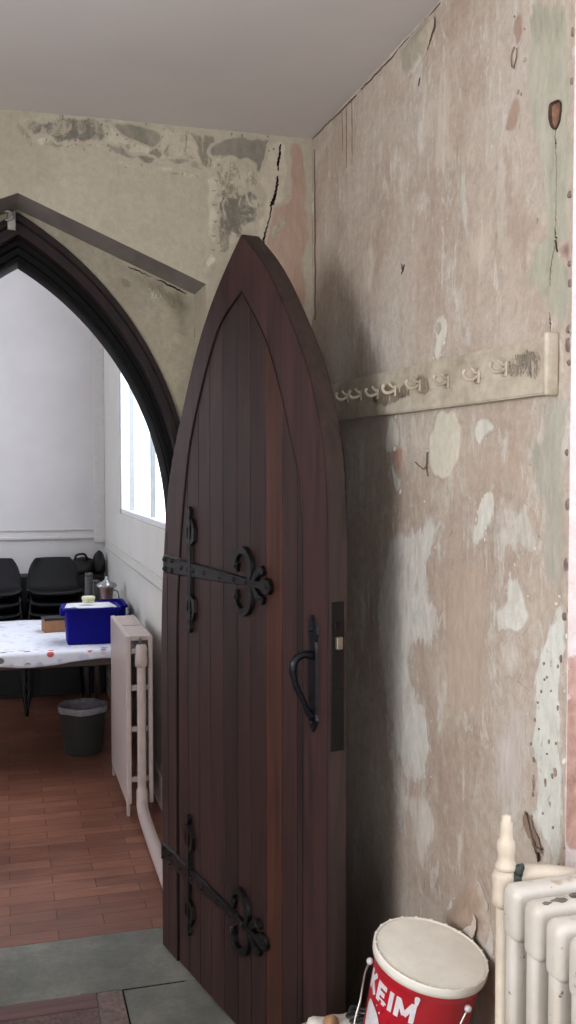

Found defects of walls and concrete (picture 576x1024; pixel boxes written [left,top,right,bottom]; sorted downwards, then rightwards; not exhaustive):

crack [128,266,186,294]
flaking render [12,112,311,318]
crack [262,144,281,240]
crack [312,3,440,263]
peeling [373,0,576,867]